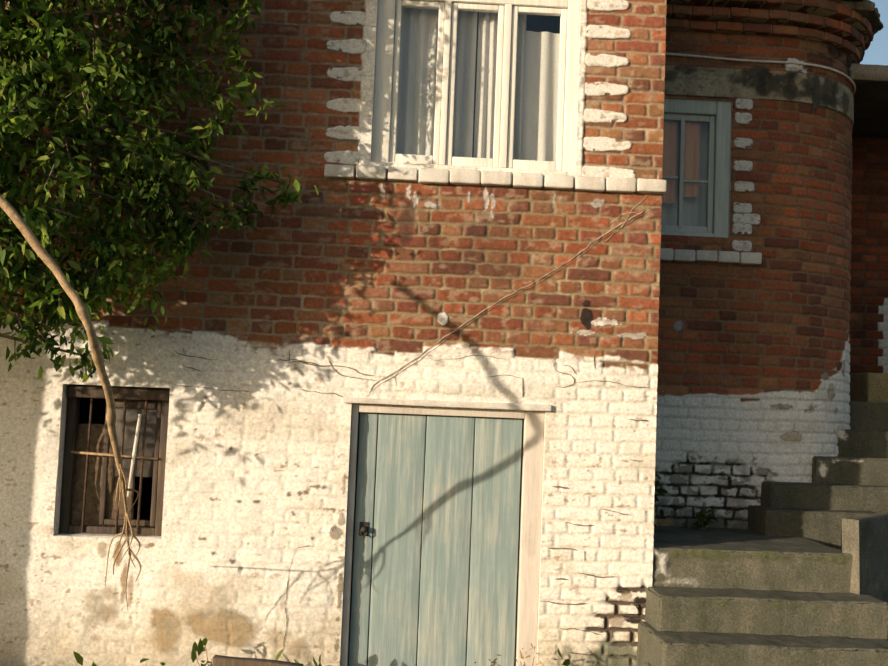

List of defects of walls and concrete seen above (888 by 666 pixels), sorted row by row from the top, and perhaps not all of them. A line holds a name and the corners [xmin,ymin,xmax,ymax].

damp [735,66,849,114]
crack [273,193,661,397]
crack [170,349,254,393]
peeling [655,453,777,530]
spalling [586,585,647,661]